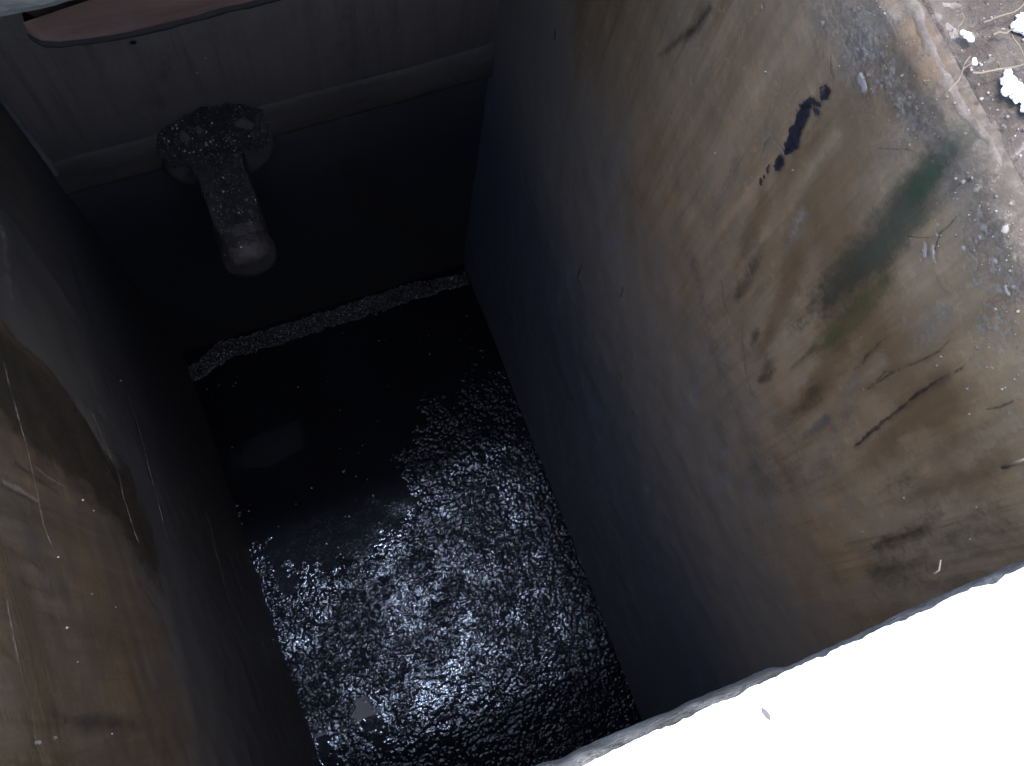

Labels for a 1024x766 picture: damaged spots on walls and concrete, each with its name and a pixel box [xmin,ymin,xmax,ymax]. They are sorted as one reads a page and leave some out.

peeling [800,84,831,116]
peeling [759,142,790,186]